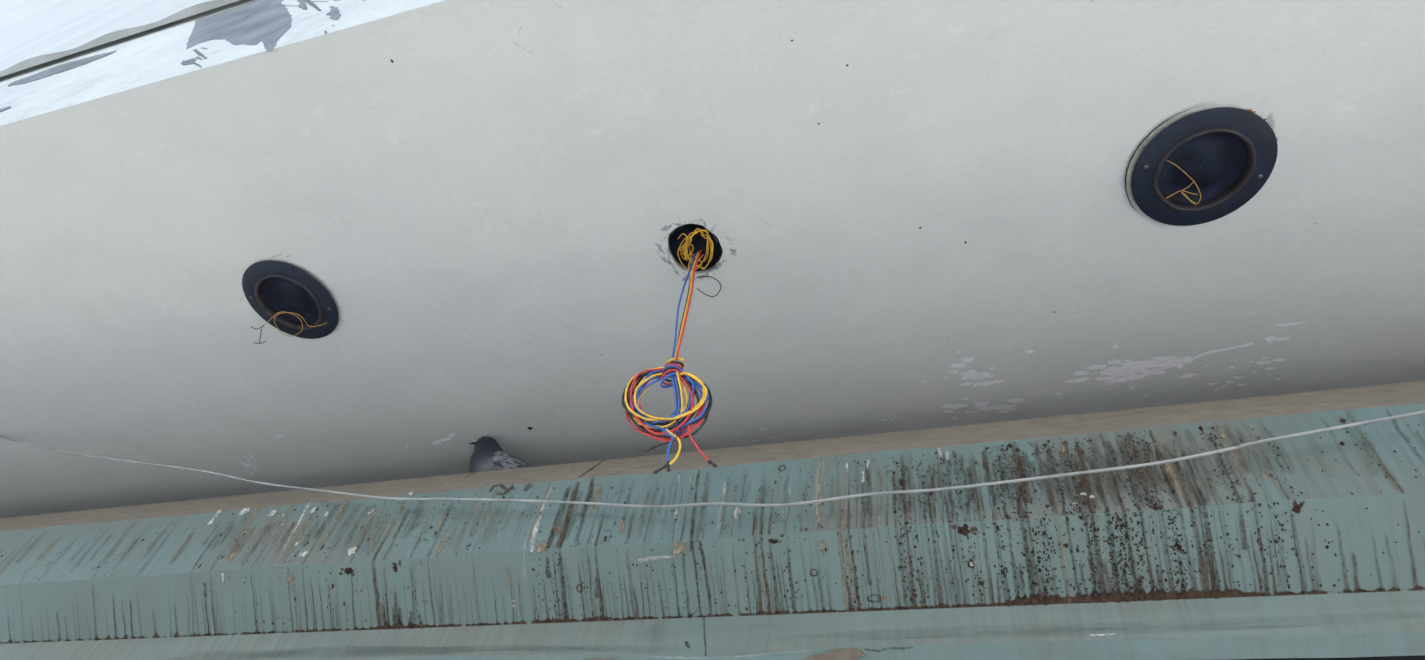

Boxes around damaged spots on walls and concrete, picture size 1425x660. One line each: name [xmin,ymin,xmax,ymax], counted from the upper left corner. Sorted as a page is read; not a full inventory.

peeling [181,0,341,67]
peeling [8,51,116,87]
peeling [940,351,1025,420]
peeling [1064,321,1309,397]
corrosion [2,478,1425,644]